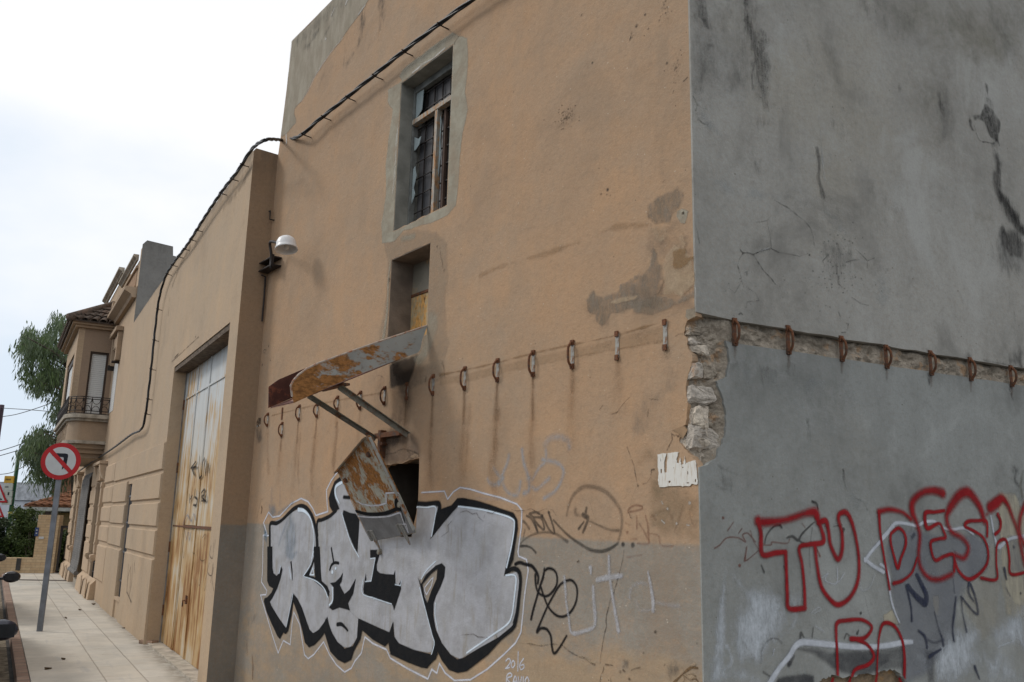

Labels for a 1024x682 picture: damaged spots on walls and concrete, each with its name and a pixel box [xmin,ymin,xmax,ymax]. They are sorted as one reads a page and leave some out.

leakage [969,106,1000,143]
leakage [994,157,1024,257]
leakage [587,237,694,324]
spalling [680,316,1024,465]